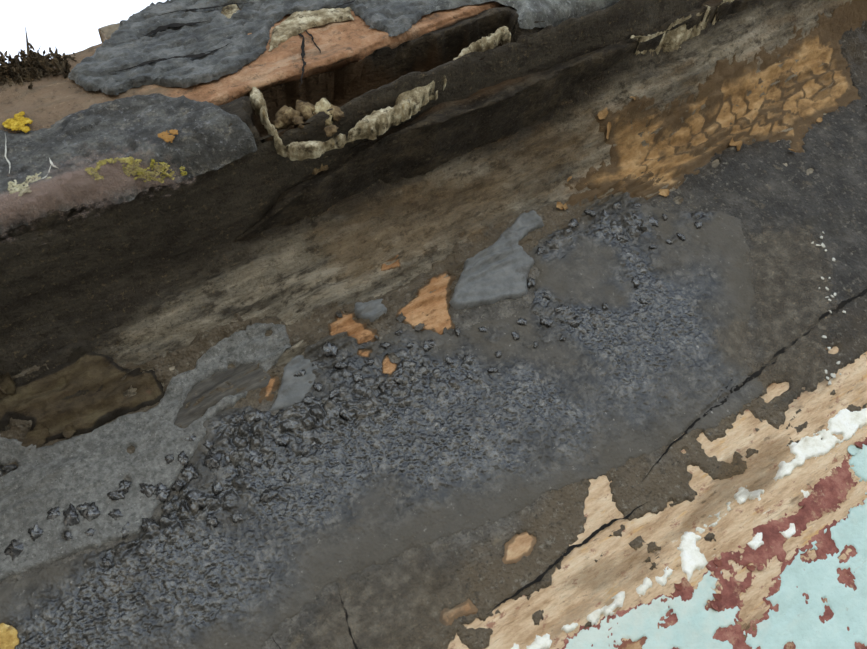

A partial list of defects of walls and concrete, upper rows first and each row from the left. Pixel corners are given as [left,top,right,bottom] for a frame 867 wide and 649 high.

spalling [269,7,354,51]
spalling [453,26,511,60]
spalling [250,75,447,175]
peeling [328,210,544,358]
crack [642,289,867,481]
peeling [636,408,867,611]
peeling [502,531,537,564]
crack [486,502,647,615]
peeling [561,591,625,633]
peeling [511,633,552,649]
peeling [619,636,646,649]
peeling [713,624,748,649]